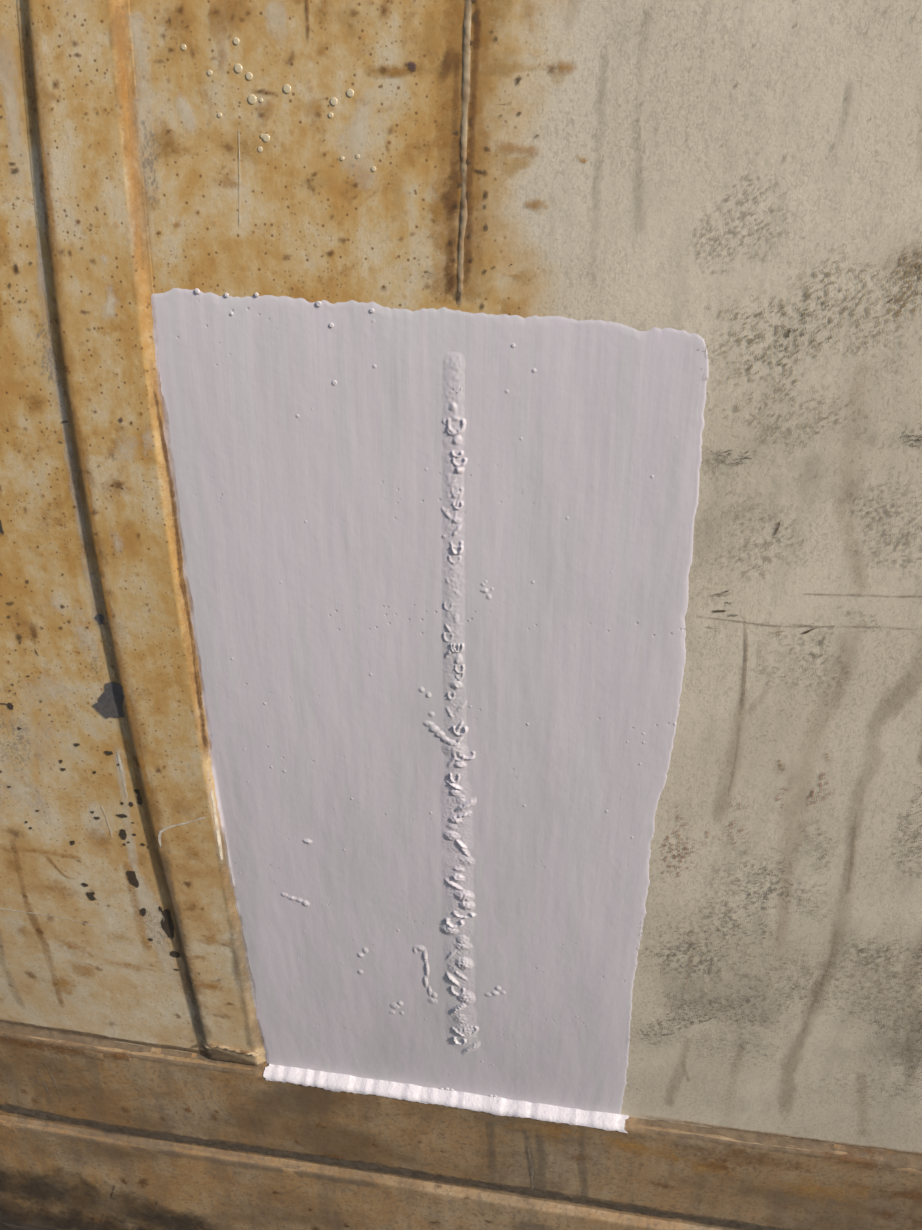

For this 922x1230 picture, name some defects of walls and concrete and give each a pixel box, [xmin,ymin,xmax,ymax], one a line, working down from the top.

rust [383,62,417,75]
rust [38,116,53,253]
rust [435,0,497,287]
rust [154,379,212,754]
peeling [92,666,124,719]
rust [233,927,252,988]